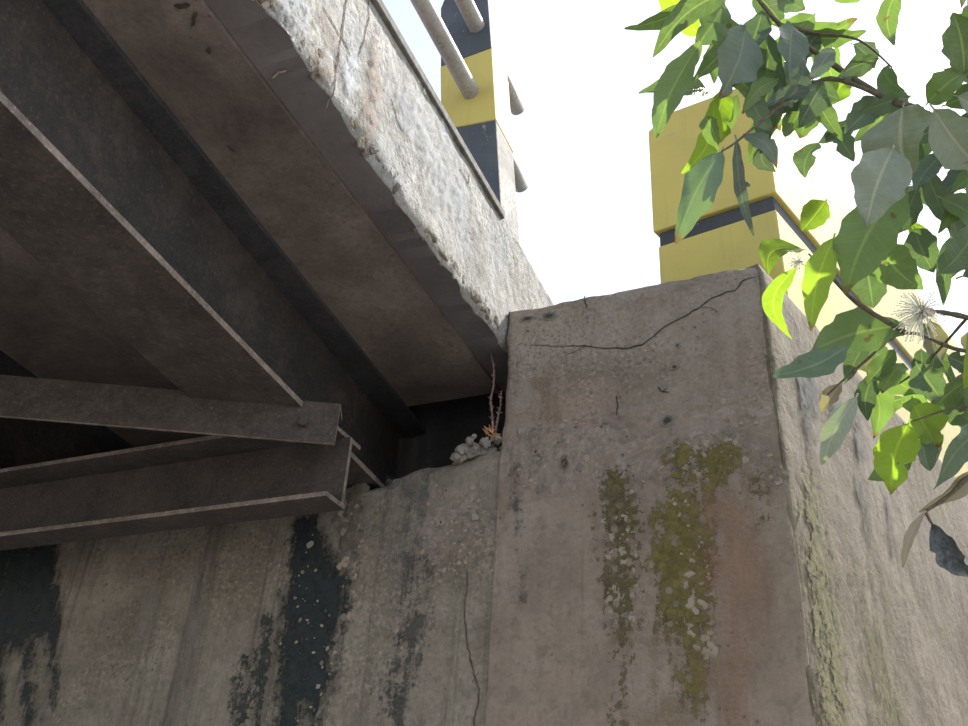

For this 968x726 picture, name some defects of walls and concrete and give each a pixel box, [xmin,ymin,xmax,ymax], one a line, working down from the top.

crack [323,0,370,114]
crack [529,277,754,354]
water stain [0,544,62,726]
water stain [227,513,352,726]
crack [464,573,480,726]
water stain [591,434,770,726]
water stain [794,377,909,726]